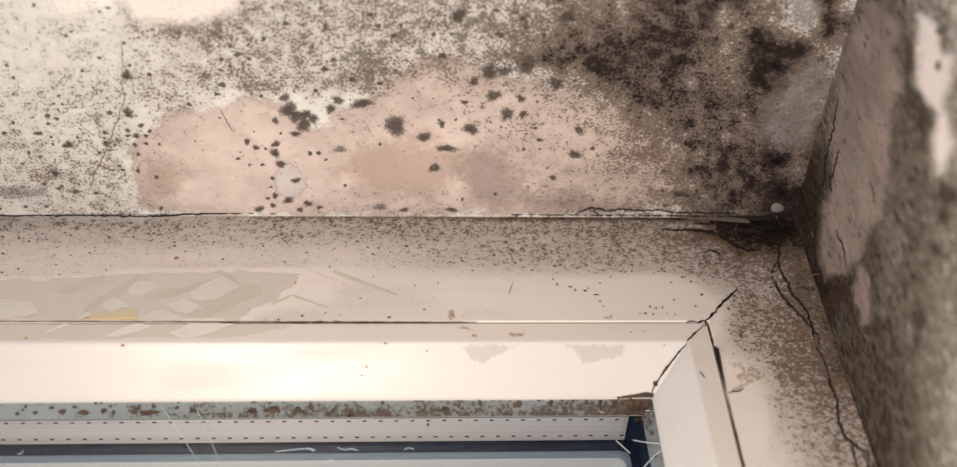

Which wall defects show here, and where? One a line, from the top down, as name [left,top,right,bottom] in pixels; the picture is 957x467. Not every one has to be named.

crack [89,47,125,190]
water stain [378,108,404,136]
water stain [244,132,285,168]
crack [0,211,291,219]
crack [507,100,877,467]